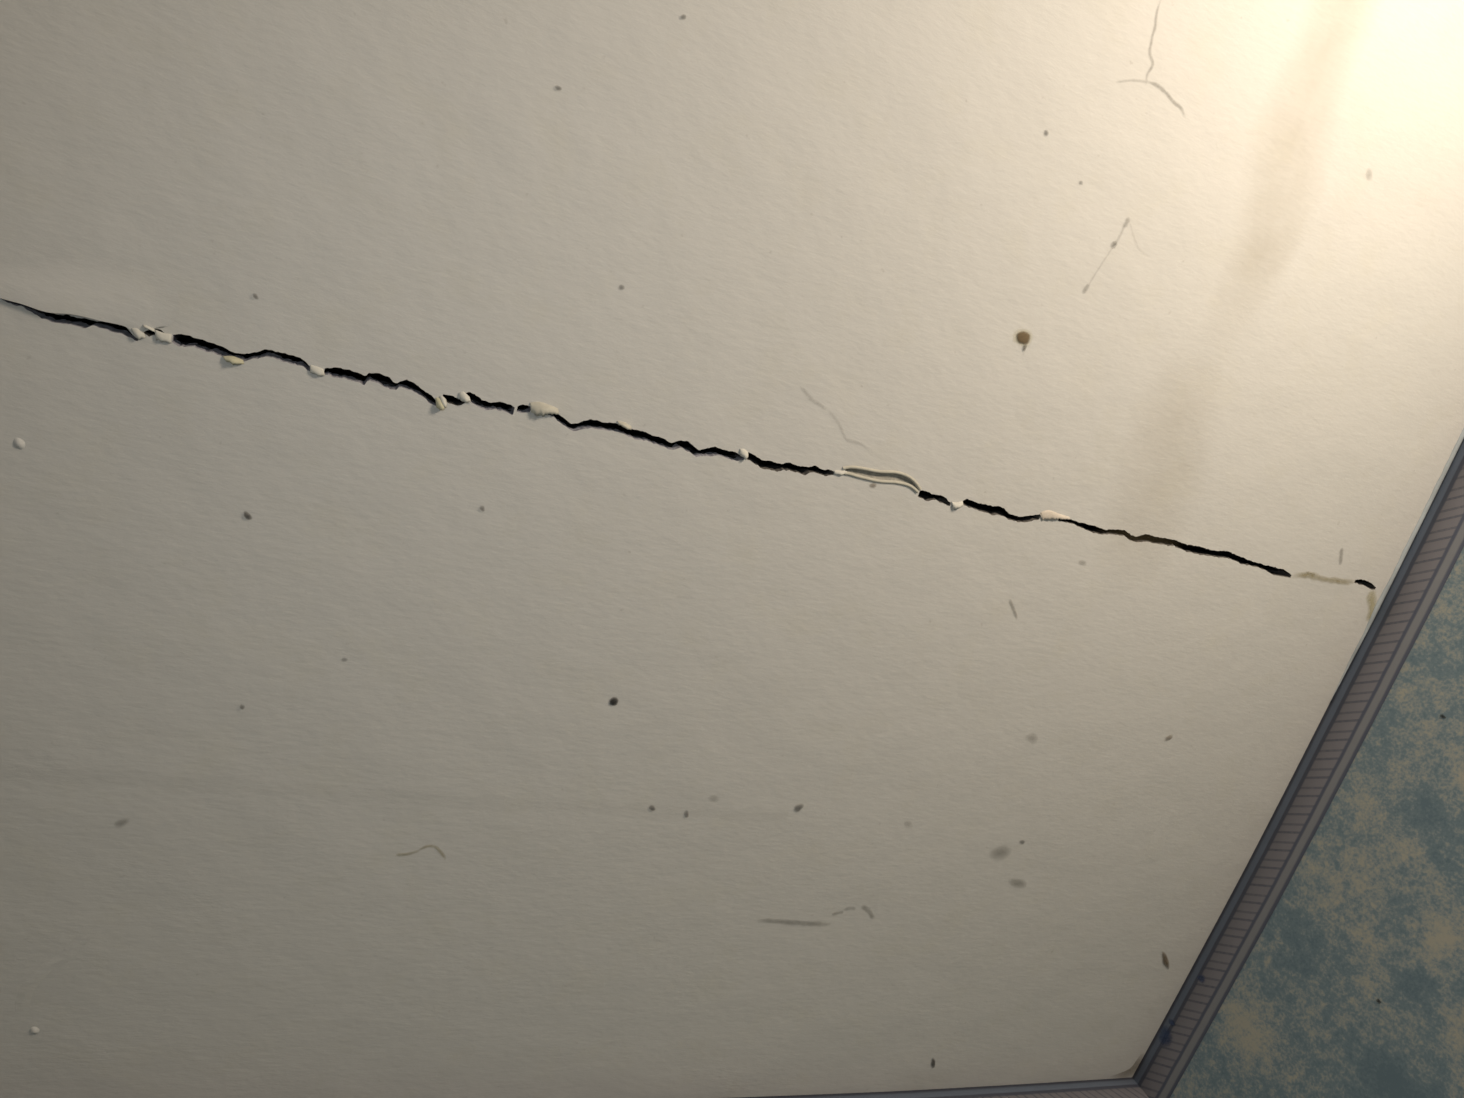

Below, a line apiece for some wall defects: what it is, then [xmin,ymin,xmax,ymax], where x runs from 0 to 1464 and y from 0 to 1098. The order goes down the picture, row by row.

crack [0,298,1376,617]